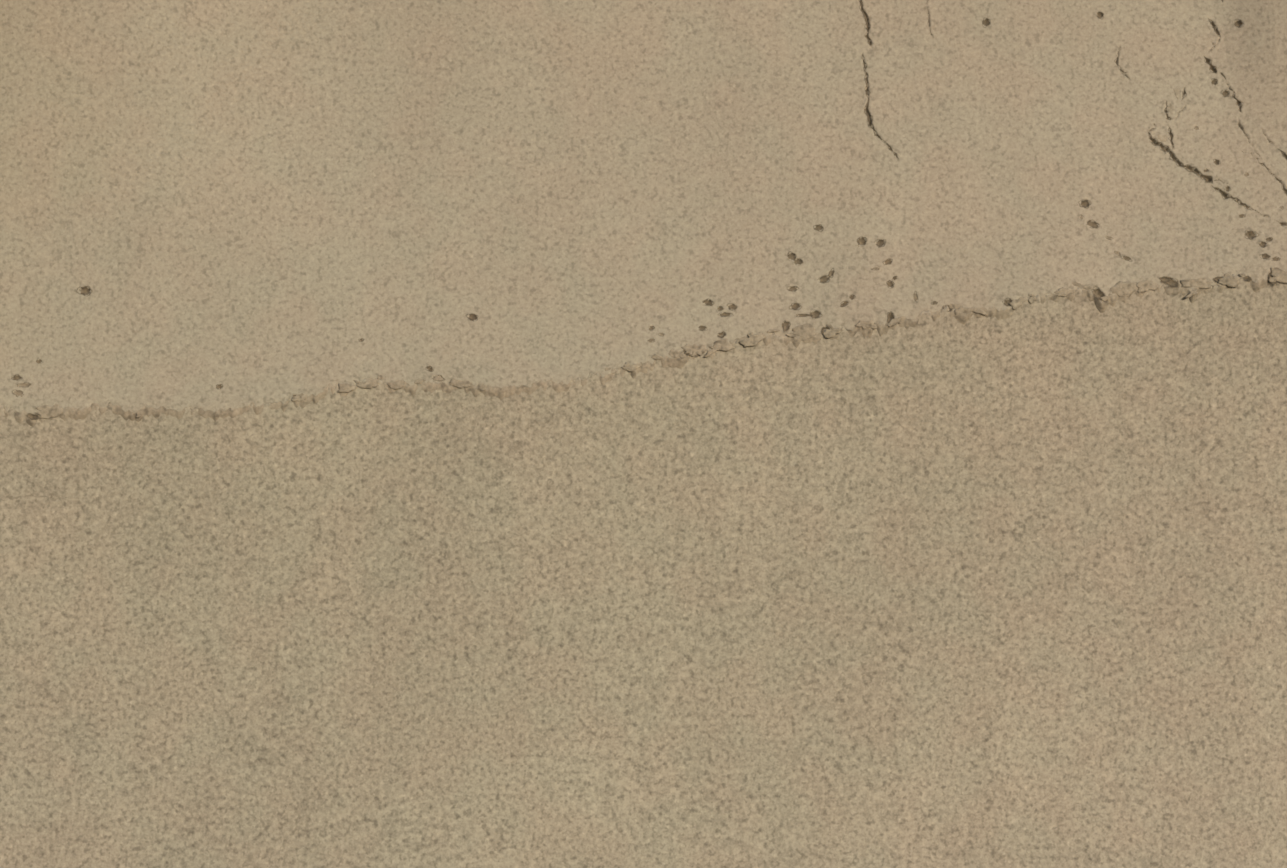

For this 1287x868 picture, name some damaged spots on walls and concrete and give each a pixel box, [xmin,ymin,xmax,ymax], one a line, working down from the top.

crack [859,0,898,158]
crack [1148,0,1287,226]
spalling [3,214,1287,427]